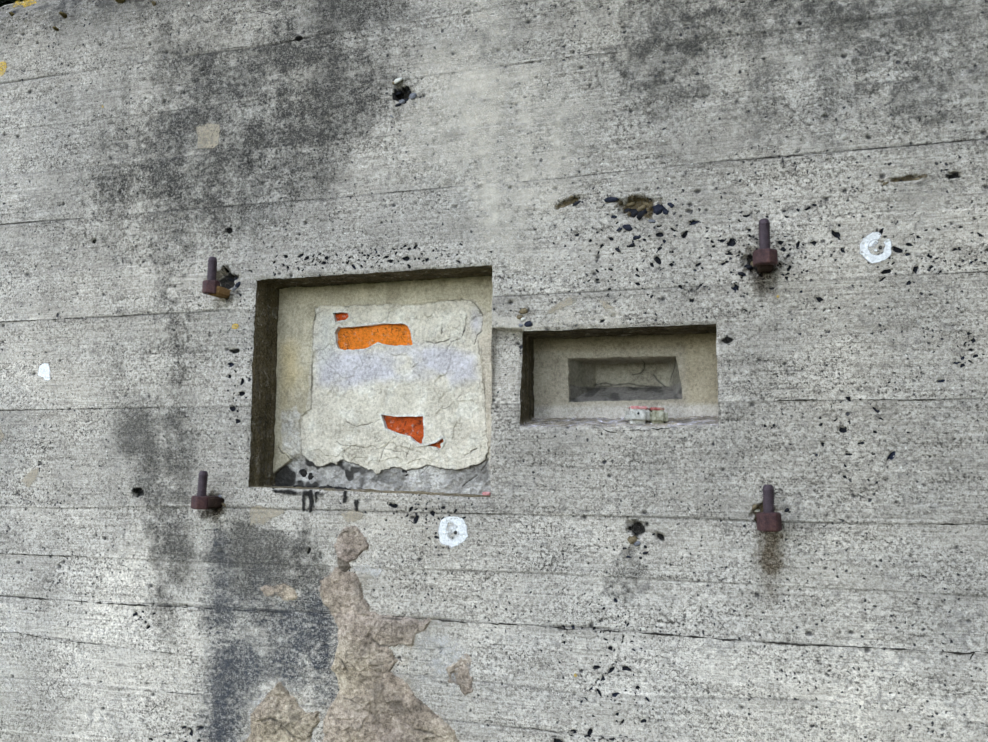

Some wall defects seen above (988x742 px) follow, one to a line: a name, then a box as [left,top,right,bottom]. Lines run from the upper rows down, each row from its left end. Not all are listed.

damp [96,0,408,272]
spalling [554,195,581,210]
spalling [568,195,699,323]
spalling [672,194,817,303]
hole [876,228,941,281]
hole [906,247,988,285]
spalling [333,312,413,350]
spalling [381,414,444,449]
damp [118,412,192,579]
damp [272,469,318,512]
damp [198,522,339,742]
peeling [245,526,460,742]